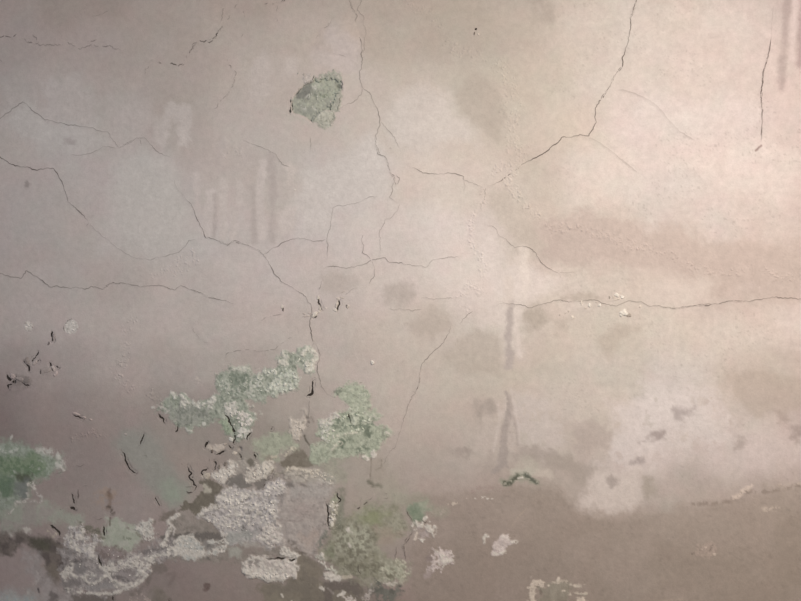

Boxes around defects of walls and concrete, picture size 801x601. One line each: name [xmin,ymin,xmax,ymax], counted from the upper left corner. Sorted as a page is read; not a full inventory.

flaking render [280,68,345,136]
crack [760,5,774,141]
water stain [774,0,801,94]
crack [0,0,696,424]
crack [492,296,801,310]
peeling [4,351,60,395]
water stain [0,183,801,601]
crack [383,310,473,465]
peeling [199,432,258,480]
flaking render [274,477,339,563]